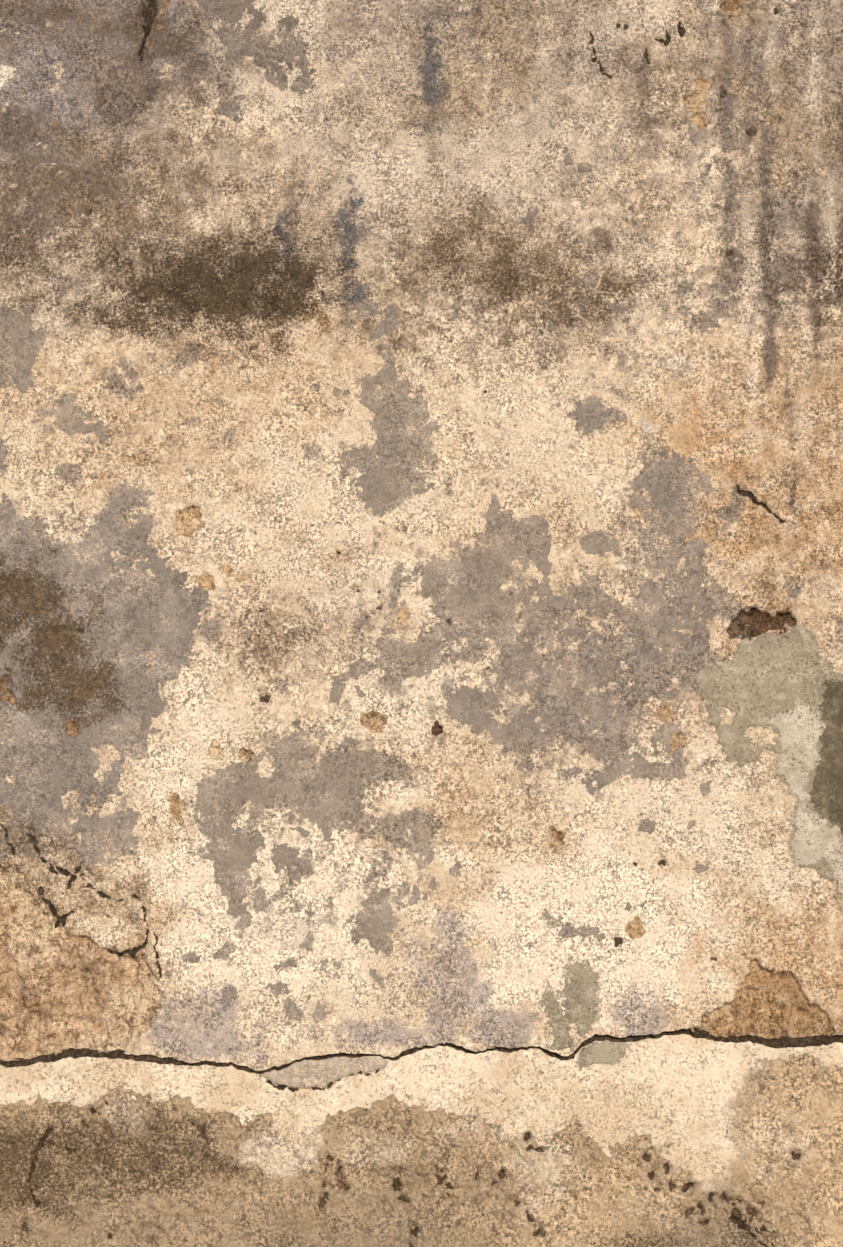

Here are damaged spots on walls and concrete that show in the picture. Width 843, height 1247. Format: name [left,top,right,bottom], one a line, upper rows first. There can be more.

crack [138,0,157,61]
water stain [74,174,365,360]
water stain [416,214,662,339]
crack [736,485,786,523]
water stain [0,547,126,728]
peeling [329,447,720,796]
flaking render [727,608,797,639]
peeling [638,819,657,838]
crack [0,823,162,981]
peeling [349,833,436,957]
peeling [0,864,843,1247]
crack [0,1029,843,1092]